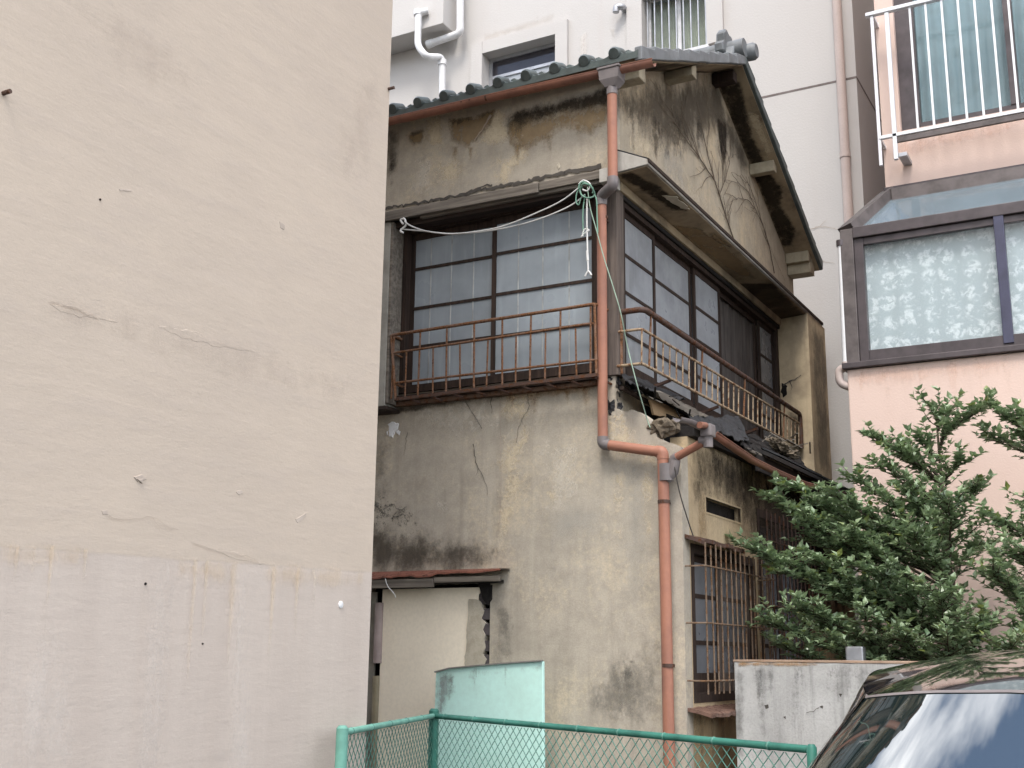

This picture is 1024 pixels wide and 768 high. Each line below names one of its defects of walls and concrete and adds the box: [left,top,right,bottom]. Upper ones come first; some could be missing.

water stain [450,111,494,152]
water stain [509,107,606,155]
peeling [386,422,401,438]
water stain [373,502,478,570]